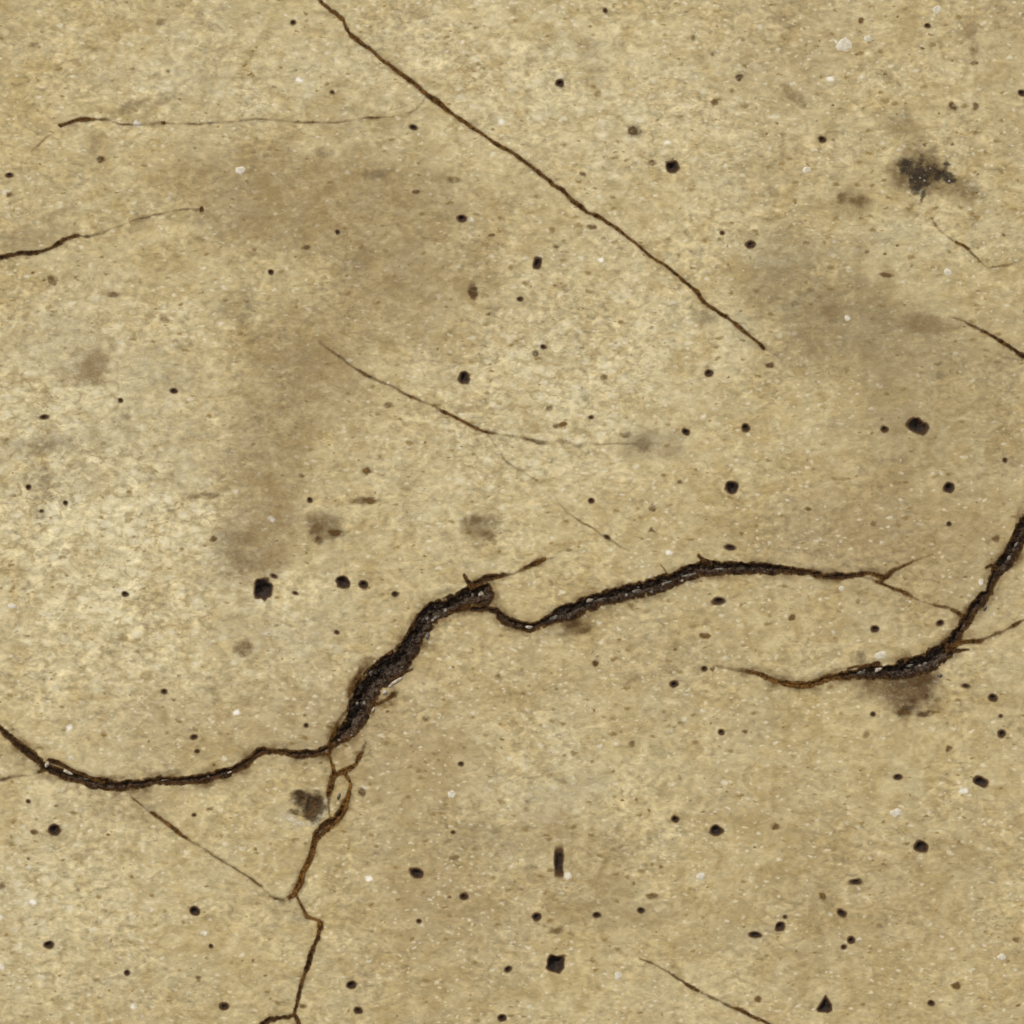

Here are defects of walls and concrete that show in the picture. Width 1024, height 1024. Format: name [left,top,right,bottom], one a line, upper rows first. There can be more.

crack [58,117,130,128]
crack [318,0,765,350]
crack [0,234,88,260]
crack [967,323,1024,358]
crack [406,394,494,434]
crack [740,516,1024,689]
crack [0,554,912,1024]